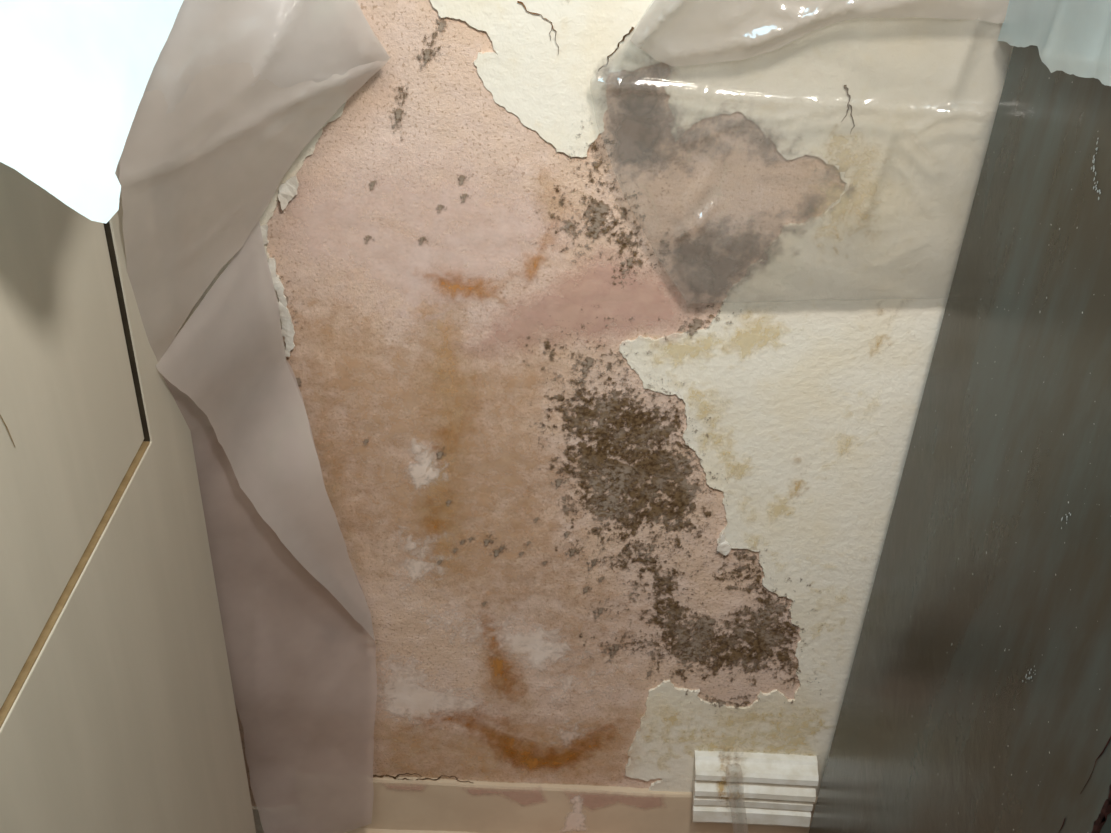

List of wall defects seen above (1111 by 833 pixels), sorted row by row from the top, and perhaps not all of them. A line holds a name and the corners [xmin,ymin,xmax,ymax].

water stain [417,18,452,69]
crack [517,1,559,54]
flaking render [261,0,845,788]
water stain [319,65,821,766]
flaking render [235,705,256,807]